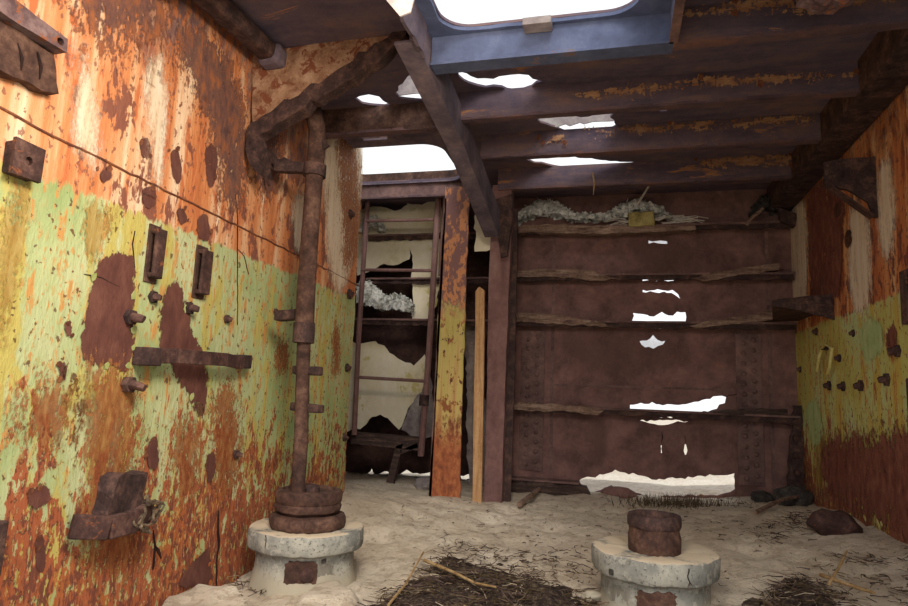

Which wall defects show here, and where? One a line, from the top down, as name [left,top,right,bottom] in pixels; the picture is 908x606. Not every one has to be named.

rust [57,0,279,227]
rust [80,198,120,263]
rust [177,206,213,242]
rust [0,183,38,349]
peeling [80,252,137,372]
peeling [159,282,203,351]
rust [271,333,292,377]
rust [330,319,342,379]
rust [1,320,251,514]
peeling [171,363,211,417]
rust [34,534,46,572]